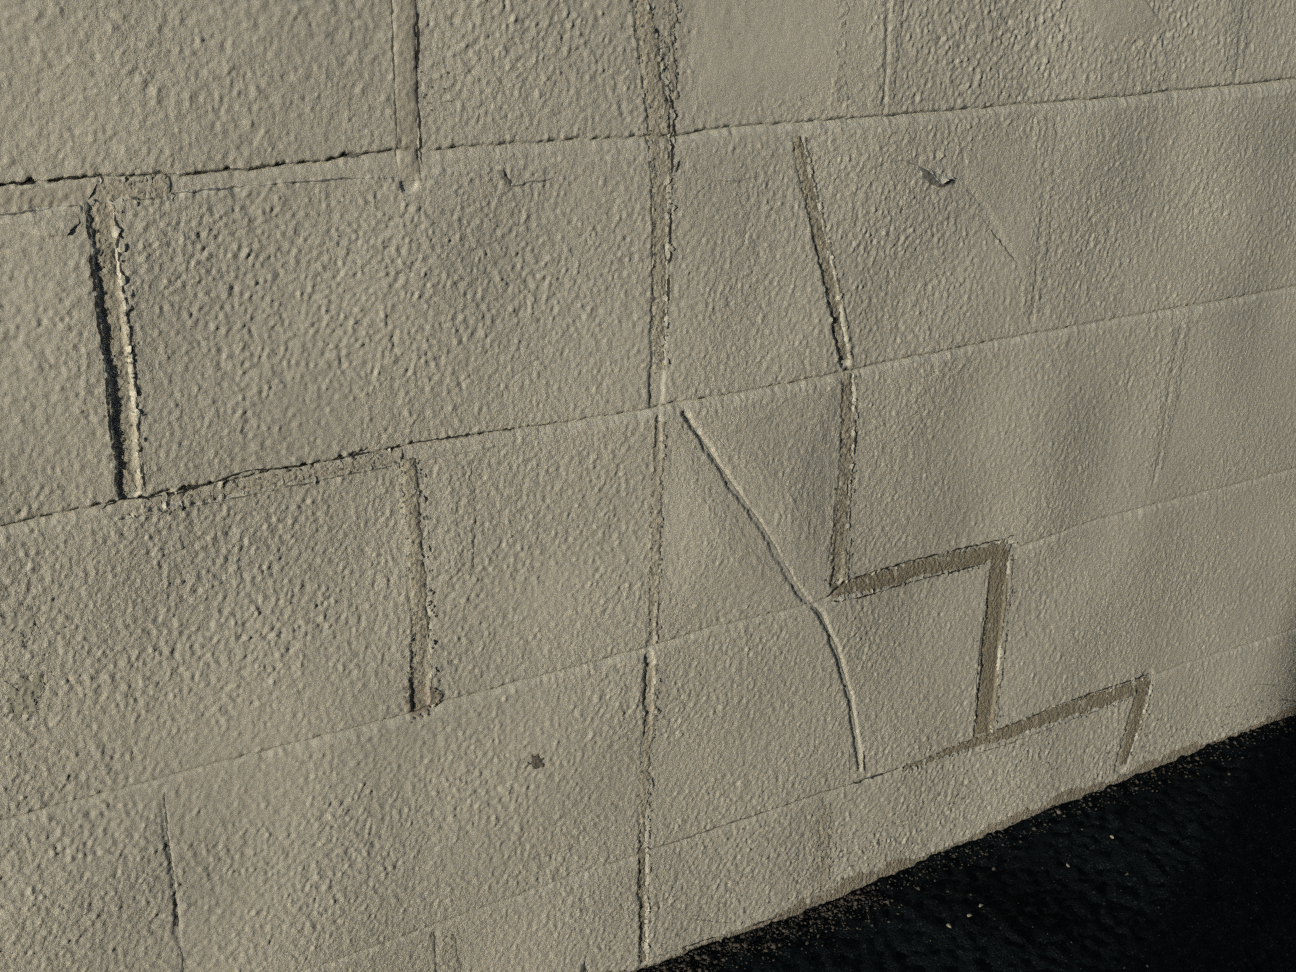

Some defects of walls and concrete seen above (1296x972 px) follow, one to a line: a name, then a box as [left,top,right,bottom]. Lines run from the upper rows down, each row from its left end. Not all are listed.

crack [0,0,561,581]
crack [636,136,1151,964]